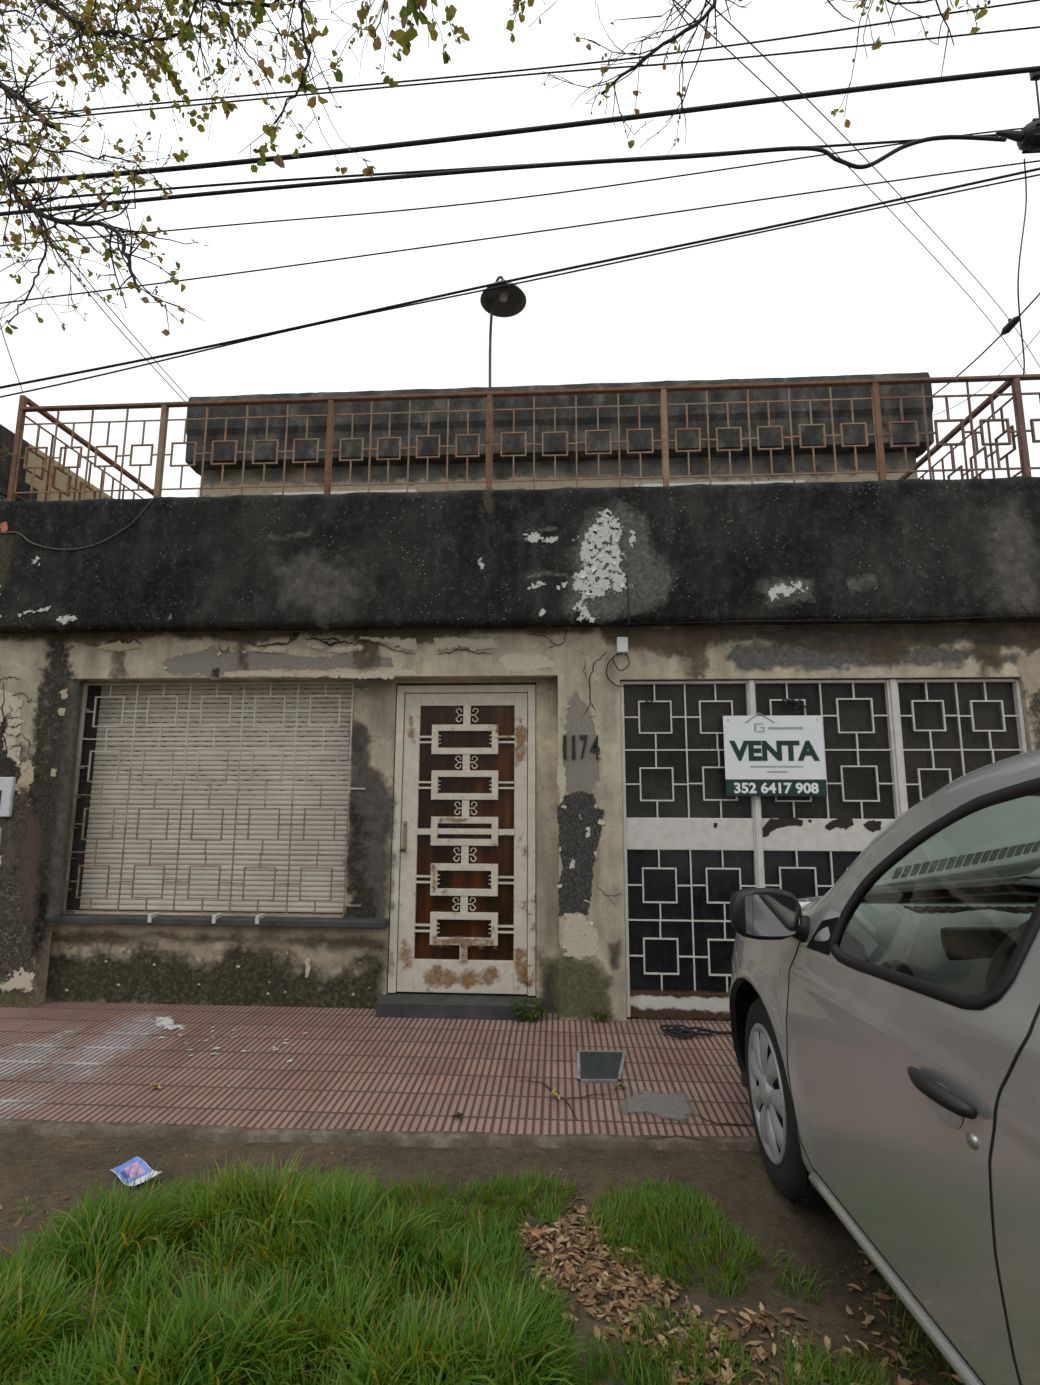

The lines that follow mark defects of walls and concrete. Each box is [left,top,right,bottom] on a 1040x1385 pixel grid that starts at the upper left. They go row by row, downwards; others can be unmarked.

peeling [523,508,636,623]
peeling [162,645,417,680]
peeling [0,690,34,794]
leakage [0,501,1040,1005]
spalling [556,692,605,961]
peeling [0,967,35,999]
corrosion [424,936,498,989]
corrosion [514,948,528,983]